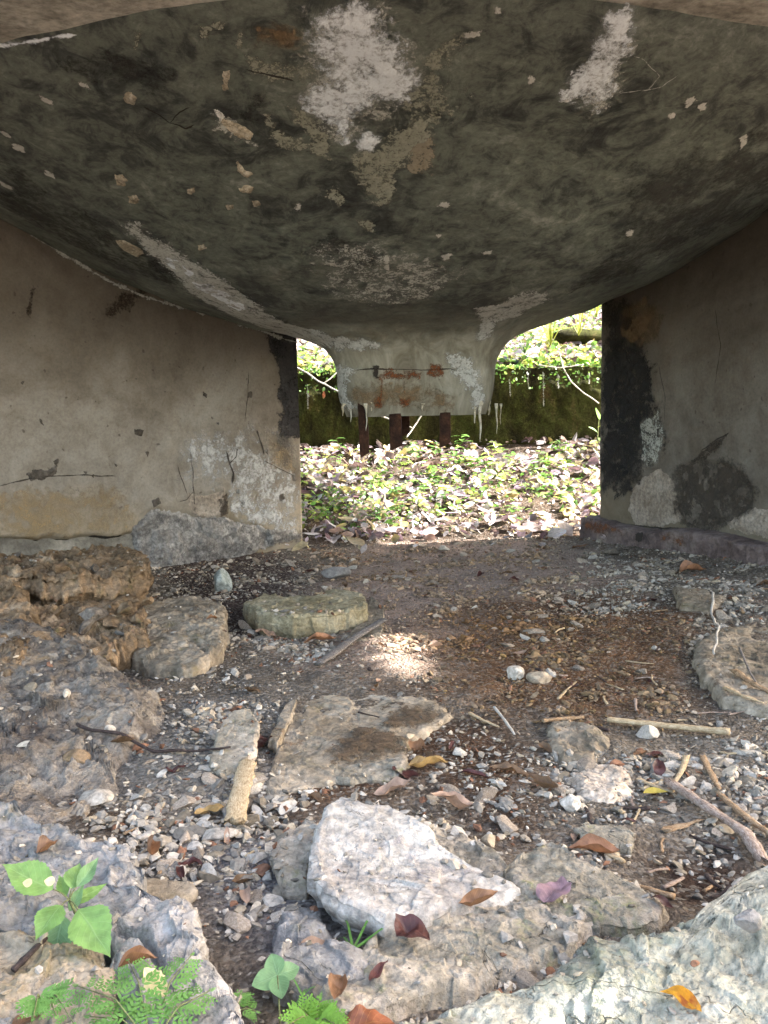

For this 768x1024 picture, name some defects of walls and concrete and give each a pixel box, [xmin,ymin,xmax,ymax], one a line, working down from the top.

peeling [263,106,334,161]
water stain [297,0,423,151]
peeling [351,31,480,207]
water stain [559,2,638,114]
peeling [325,186,345,206]
peeling [356,219,376,233]
water stain [114,221,452,466]
rust [375,364,444,408]
water stain [446,353,485,409]
water stain [588,297,666,500]
crack [1,474,113,486]
spalling [628,437,768,539]